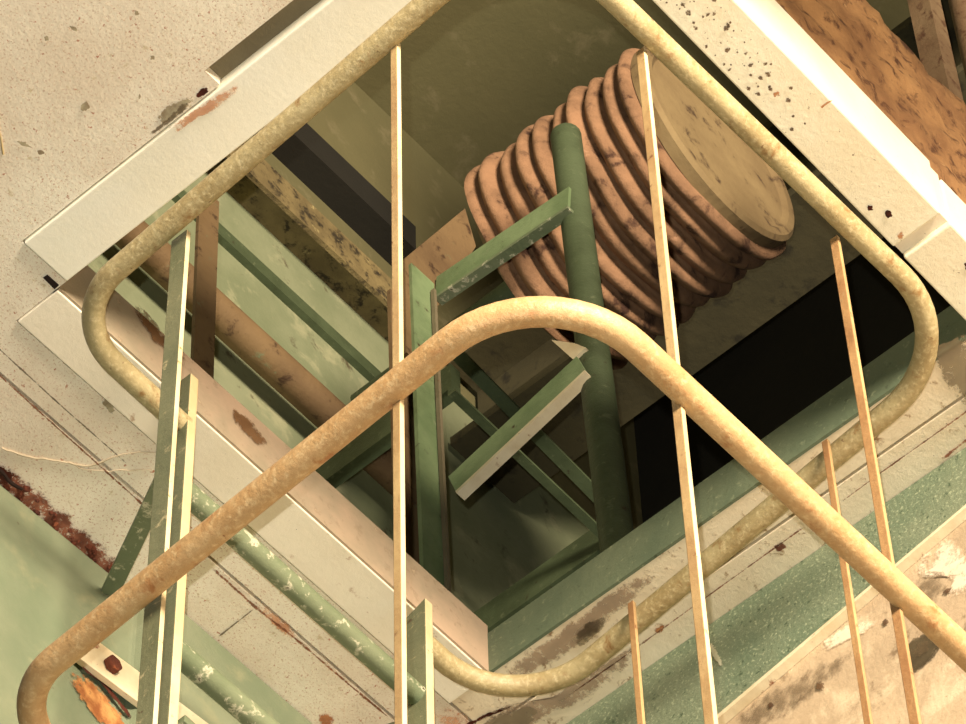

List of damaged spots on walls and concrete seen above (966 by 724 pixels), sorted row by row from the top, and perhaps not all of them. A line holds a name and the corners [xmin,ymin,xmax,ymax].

water stain [937,335,966,402]
rust [72,667,131,724]
rust [441,707,508,724]